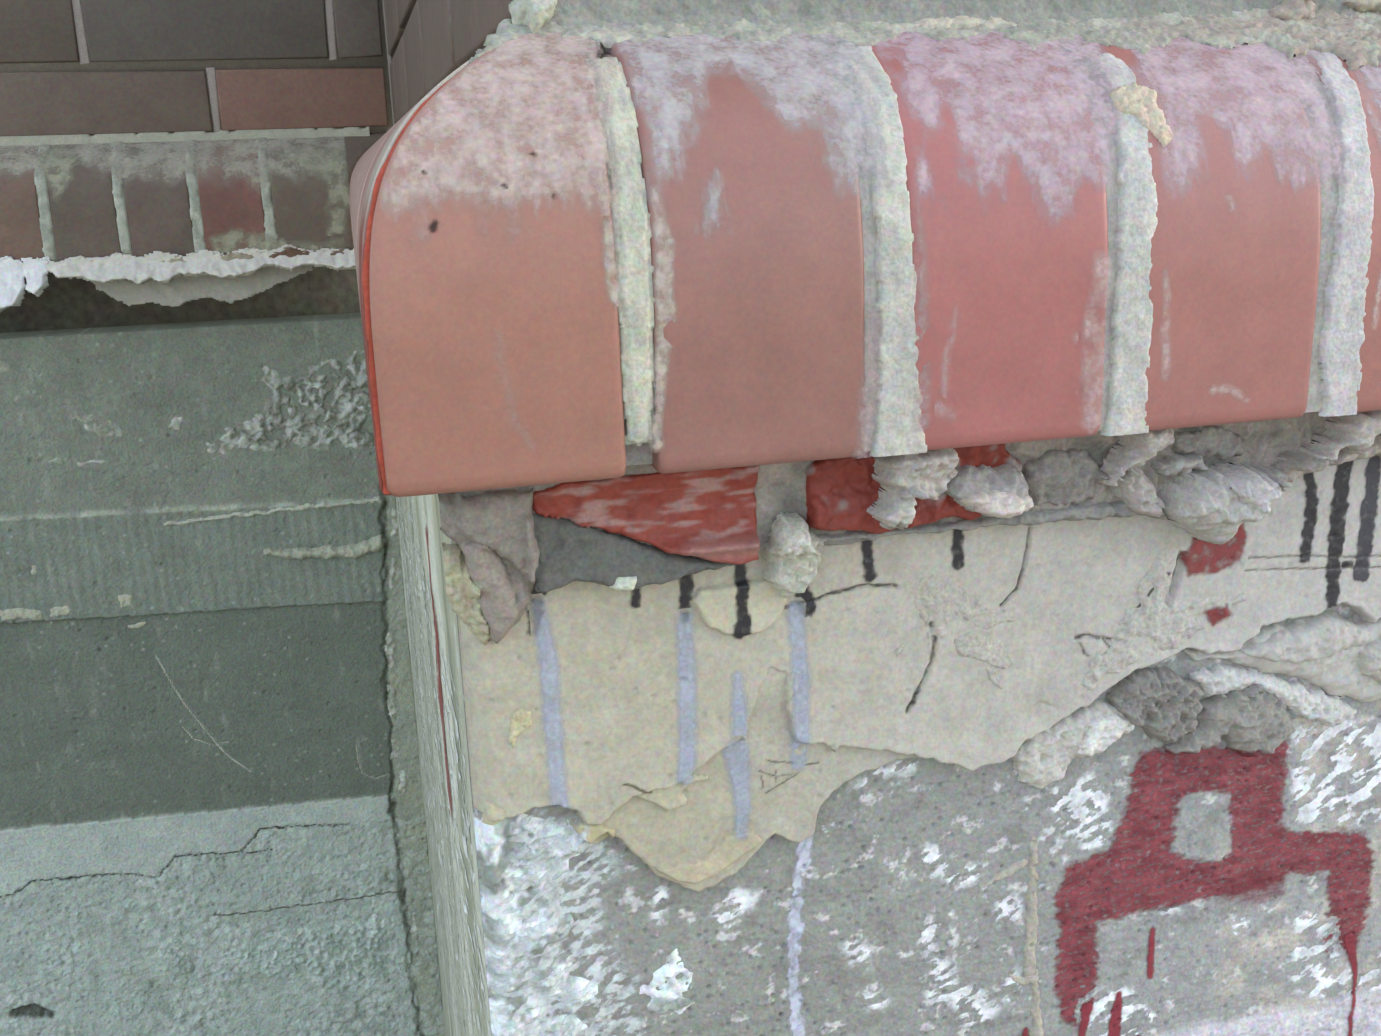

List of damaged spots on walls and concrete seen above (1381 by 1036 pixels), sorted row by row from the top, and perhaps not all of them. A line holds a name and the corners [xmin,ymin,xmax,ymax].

water stain [1132,36,1344,189]
water stain [1359,60,1381,137]
water stain [0,136,346,185]
peeling [0,244,356,313]
water stain [383,27,1119,455]
spalling [206,350,375,455]
spalling [389,556,402,590]
spalling [384,631,398,719]
peeling [458,455,1381,892]
crack [906,622,936,712]
spalling [390,738,408,798]
crack [0,824,341,898]